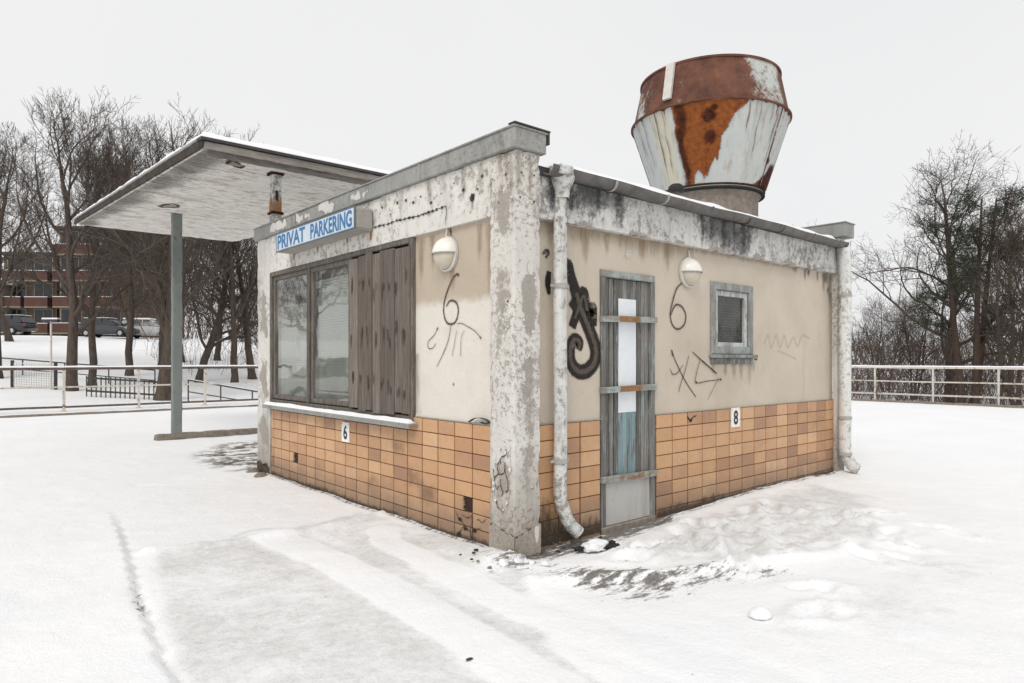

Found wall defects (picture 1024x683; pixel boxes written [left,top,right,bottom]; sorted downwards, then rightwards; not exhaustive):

corrosion [637,99,779,191]
corrosion [269,190,282,212]
peeling [270,201,334,232]
damp [701,215,752,254]
peeling [491,354,539,510]
spalling [462,496,473,512]
spalling [489,515,541,556]